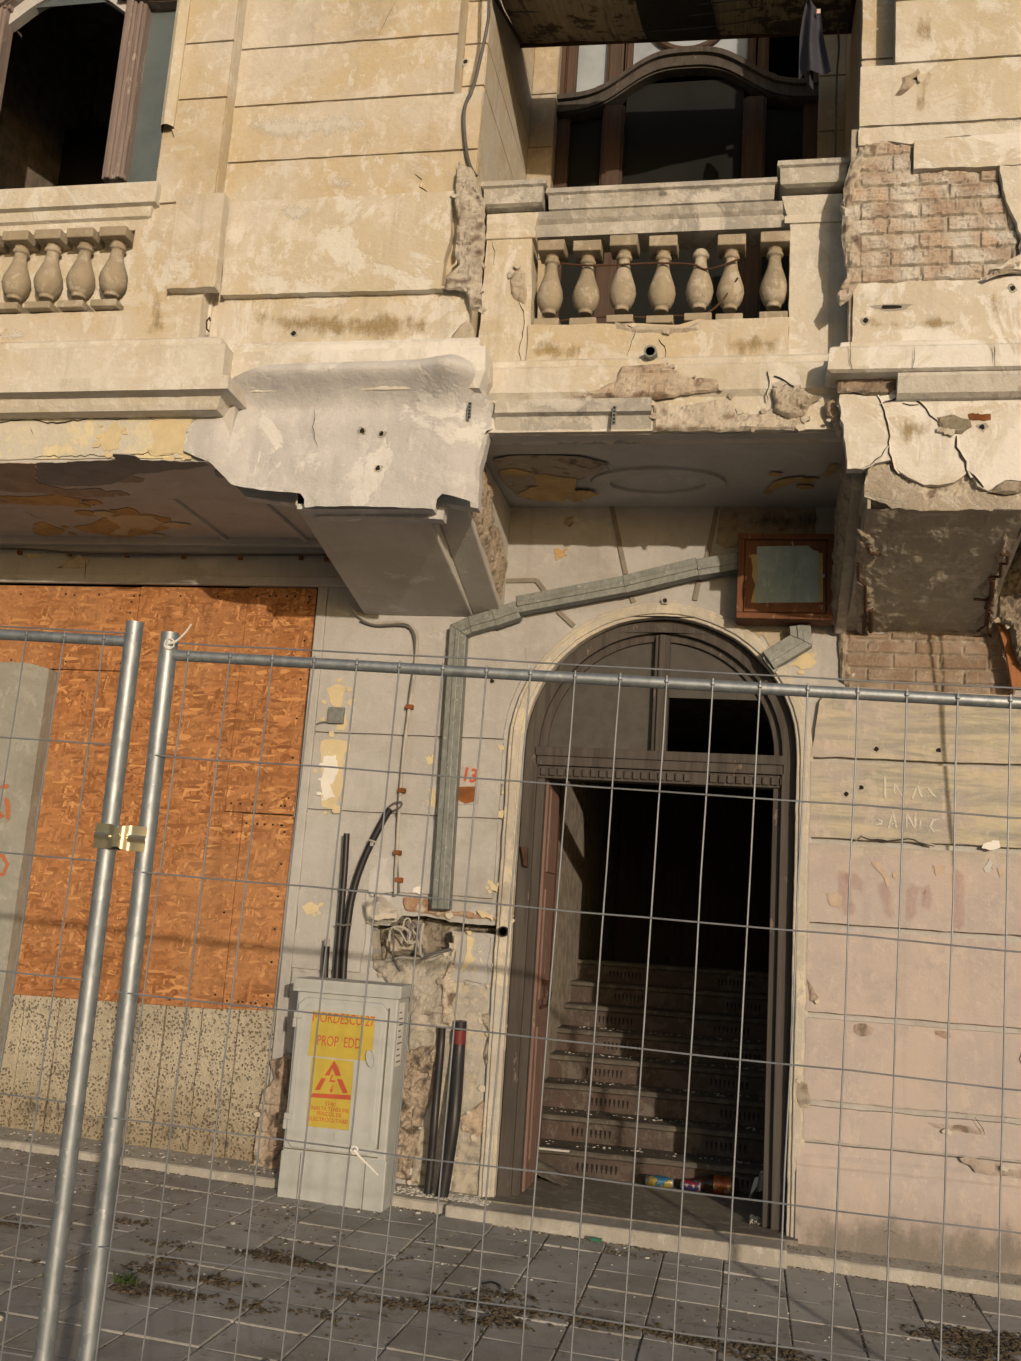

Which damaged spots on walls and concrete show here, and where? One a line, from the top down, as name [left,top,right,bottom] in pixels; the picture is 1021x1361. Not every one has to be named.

flaking render [441,162,487,338]
flaking render [836,140,1021,306]
peeling [0,419,226,538]
flaking render [470,468,600,600]
flaking render [563,359,1021,696]
crack [862,395,985,487]
flaking render [361,852,515,1195]